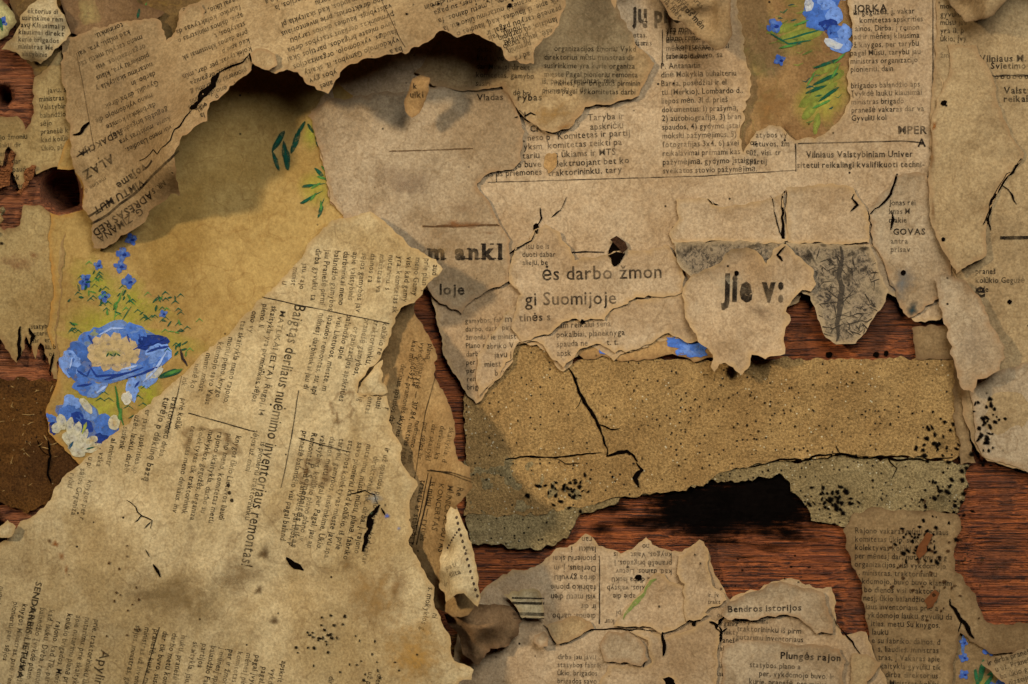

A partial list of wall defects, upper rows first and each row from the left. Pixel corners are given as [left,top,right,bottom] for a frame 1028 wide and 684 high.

peeling [404,75,430,118]
crack [505,369,643,488]
crack [749,446,953,478]